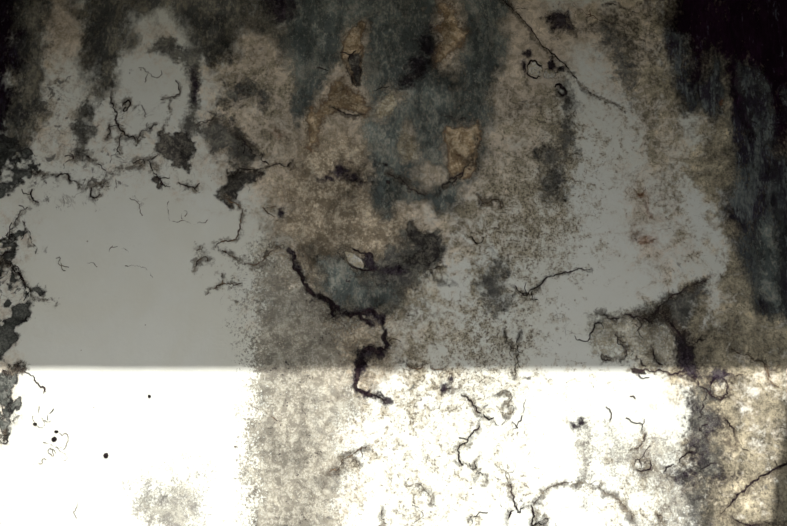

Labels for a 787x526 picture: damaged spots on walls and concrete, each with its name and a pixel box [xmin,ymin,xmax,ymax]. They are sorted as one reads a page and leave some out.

peeling [0,134,41,198]
peeling [0,230,47,441]
damp [0,0,54,158]
crack [2,360,69,464]
crack [0,67,207,306]
damp [65,0,515,526]
peeling [305,0,469,153]
crack [191,116,638,526]
peeling [443,120,482,180]
crack [575,276,783,479]
damp [659,0,787,318]
crack [720,460,787,526]